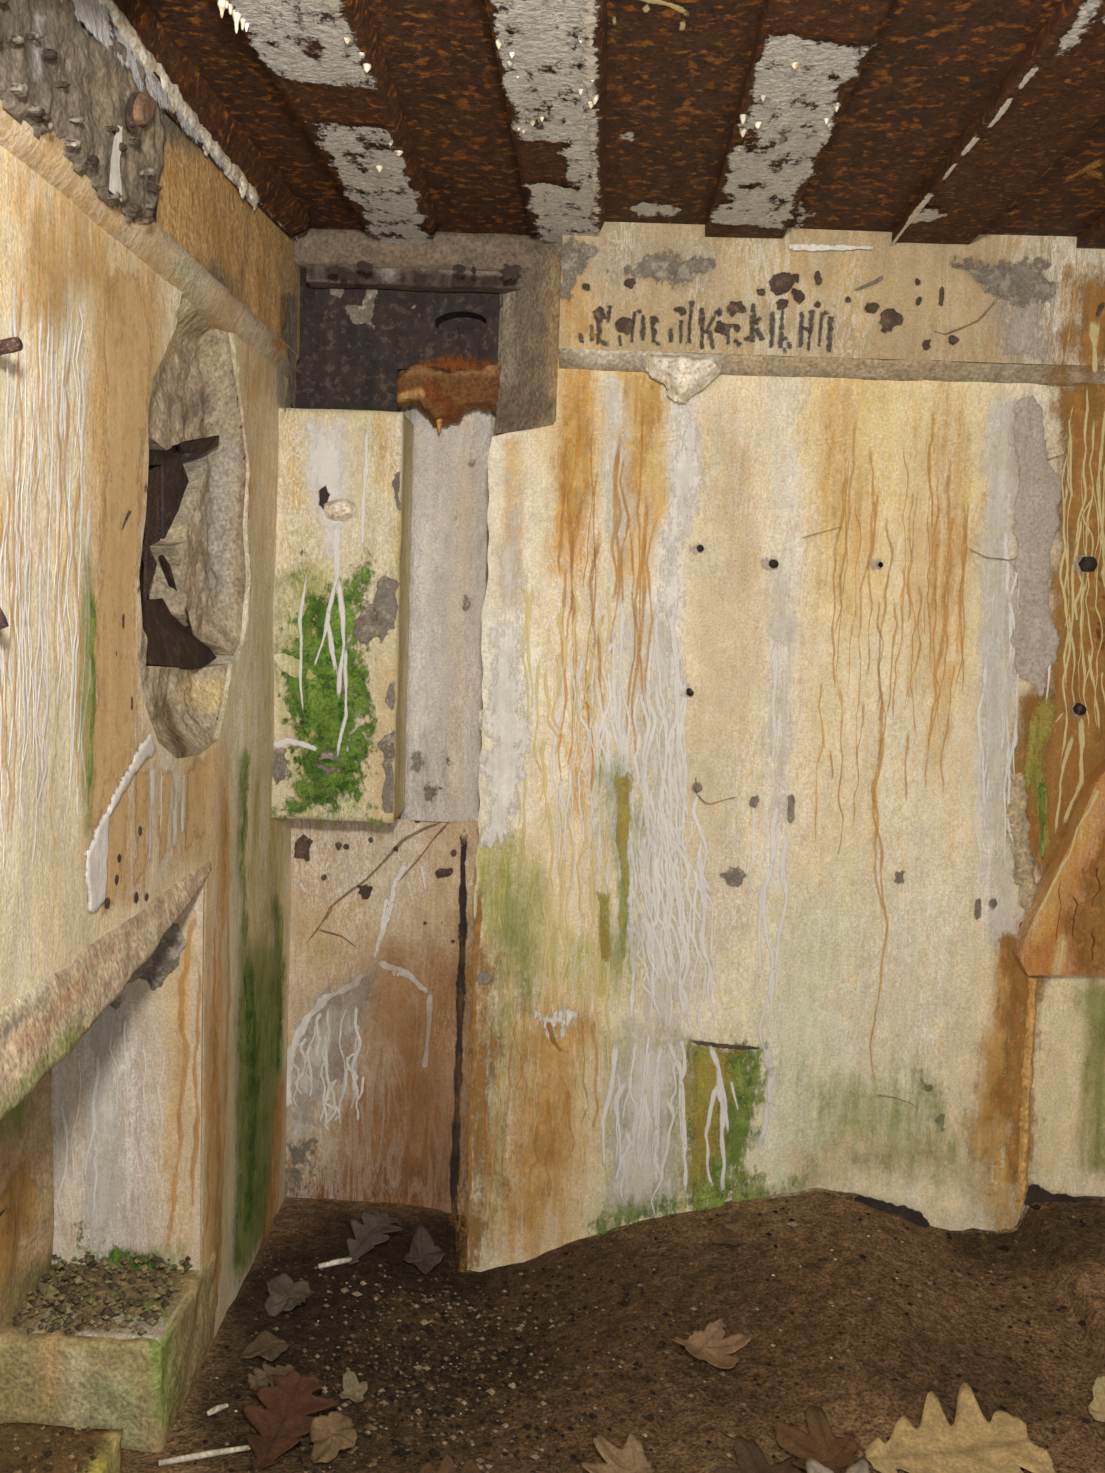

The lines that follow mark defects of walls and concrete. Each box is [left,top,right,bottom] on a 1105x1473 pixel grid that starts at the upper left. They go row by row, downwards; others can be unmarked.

spalling [87,268,247,917]
water stain [274,738,316,751]
water stain [298,420,368,755]
water stain [285,865,433,1199]
crack [310,822,447,946]
water stain [478,391,738,1222]
corrosion [557,379,660,787]
corrosion [963,265,1105,1231]